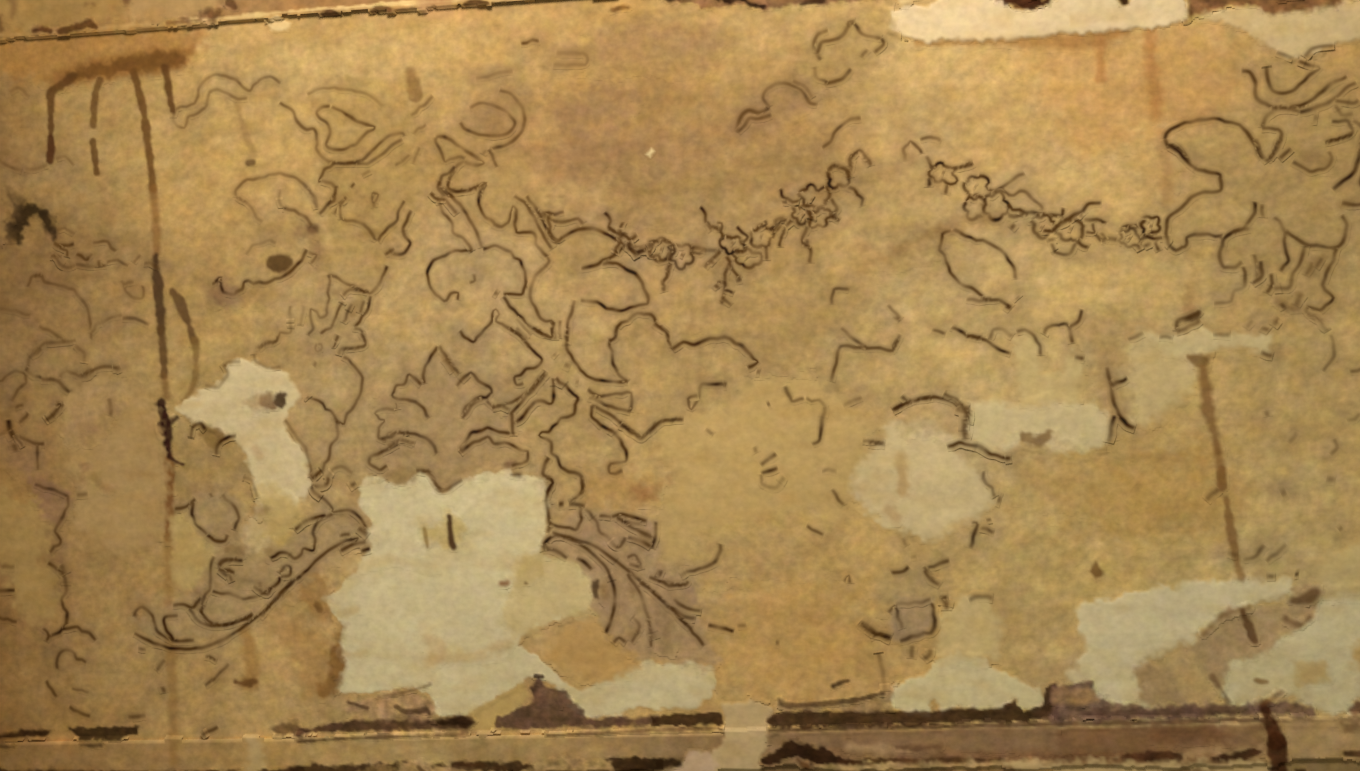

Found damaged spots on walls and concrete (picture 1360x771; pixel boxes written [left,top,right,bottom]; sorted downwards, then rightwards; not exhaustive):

peeling [0,0,535,38]
spalling [595,0,632,15]
peeling [658,0,1360,59]
water stain [0,11,323,513]
water stain [332,278,376,321]
water stain [332,185,383,243]
peeling [0,355,313,632]
peeling [641,334,1112,568]
water stain [988,411,1270,582]
water stain [161,642,183,768]
peeling [170,473,1267,771]
peeling [1058,533,1360,714]